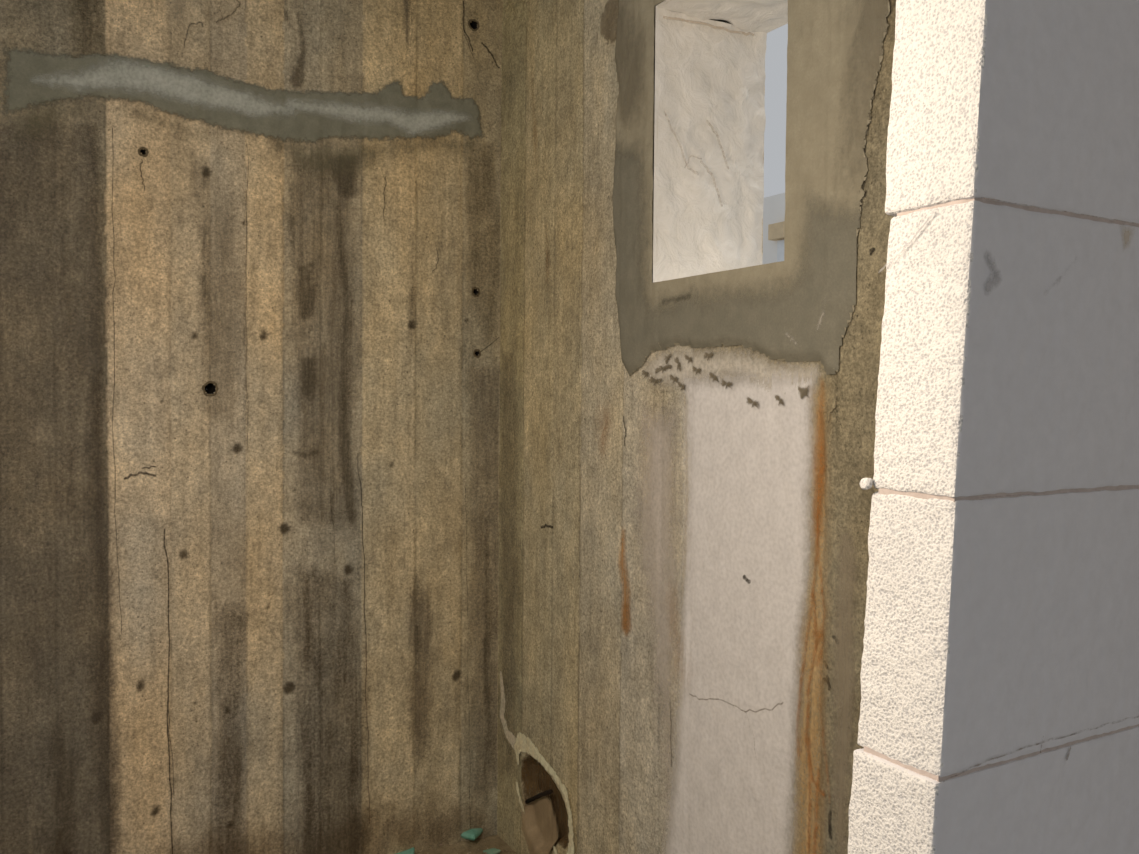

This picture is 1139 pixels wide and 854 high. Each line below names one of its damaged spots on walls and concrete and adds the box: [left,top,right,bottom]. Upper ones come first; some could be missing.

leakage [297,152,375,517]
leakage [612,146,860,854]
corrosion [799,393,825,854]